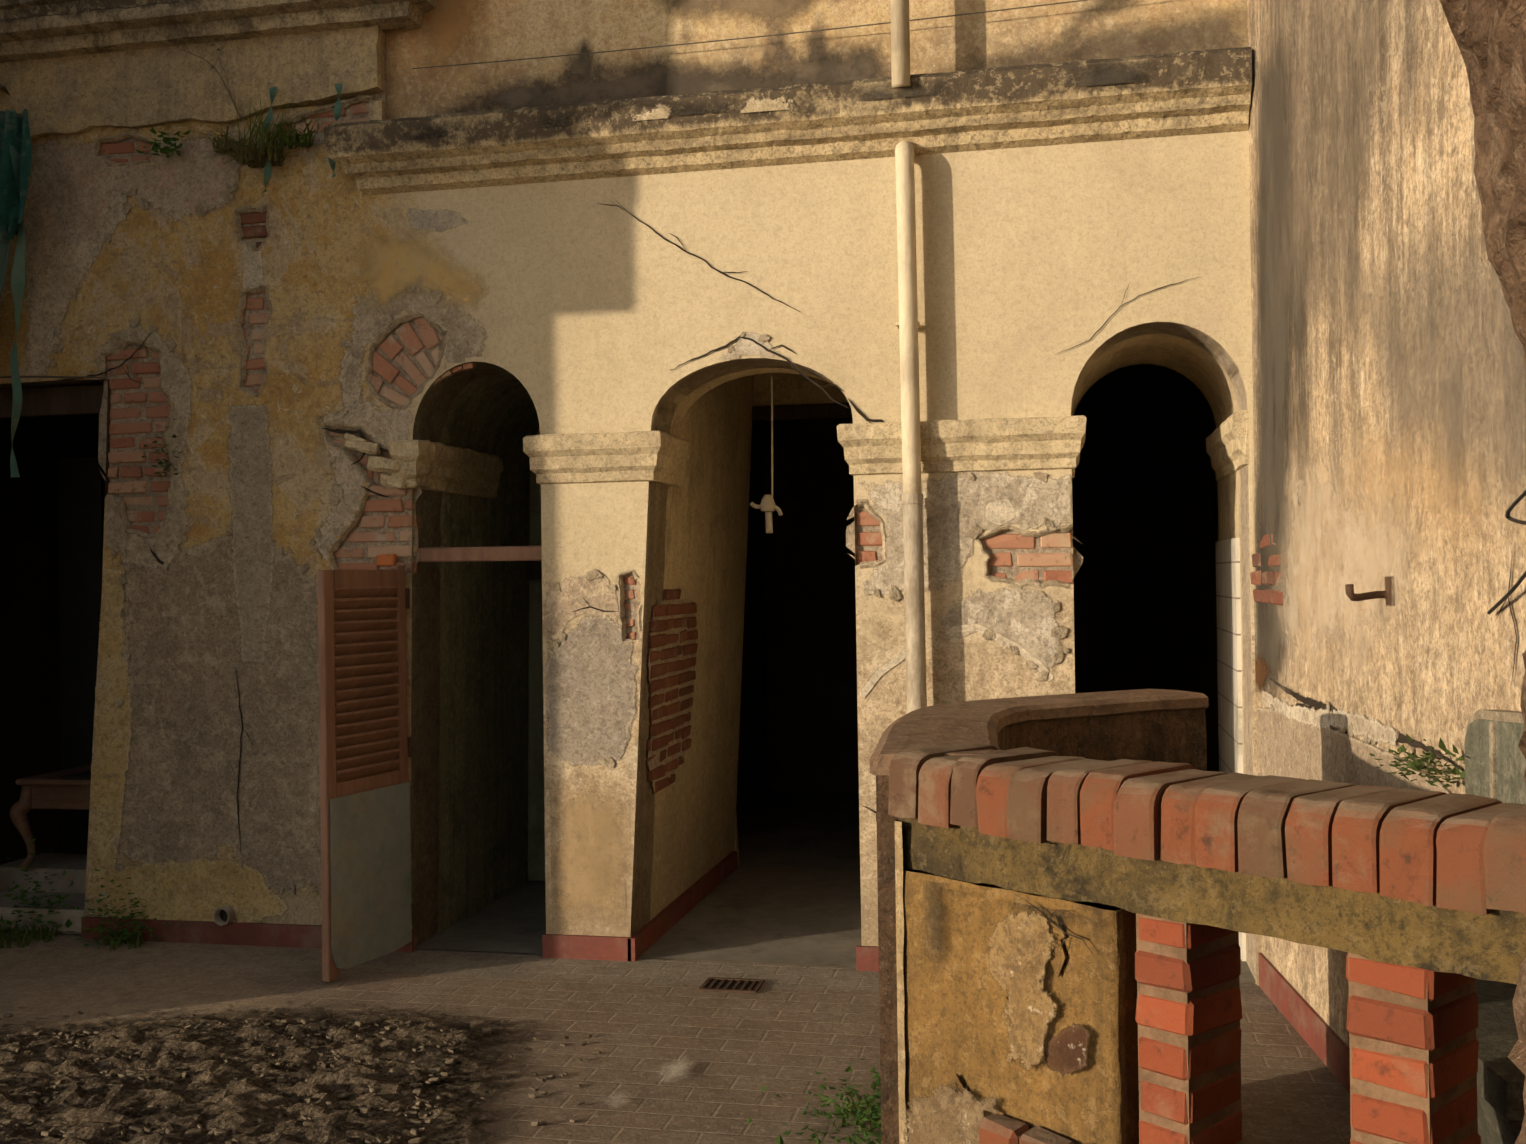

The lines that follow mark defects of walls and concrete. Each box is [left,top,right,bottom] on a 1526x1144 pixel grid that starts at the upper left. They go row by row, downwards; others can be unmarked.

peeling [24,131,271,376]
peeling [407,209,469,232]
crack [597,203,800,312]
crack [671,336,884,423]
crack [1054,277,1198,355]
damp [1254,34,1389,694]
flaking render [87,283,487,901]
flaking render [846,479,905,602]
flaking render [922,471,1083,681]
flaking render [544,569,698,794]
flaking render [987,910,1090,1076]